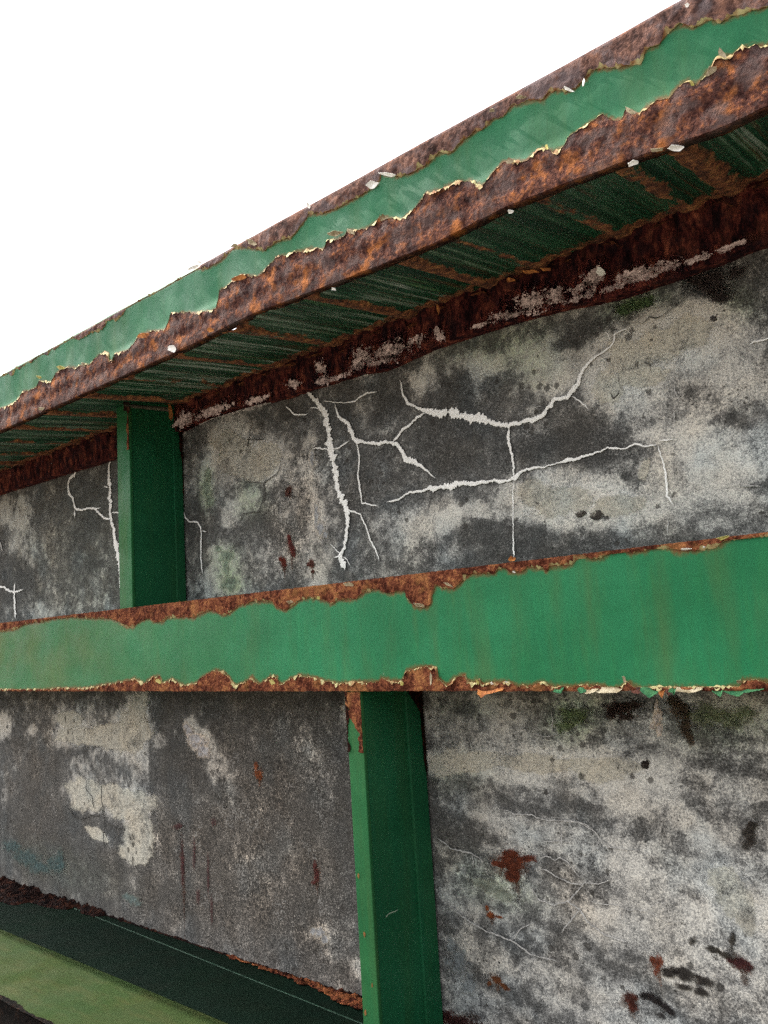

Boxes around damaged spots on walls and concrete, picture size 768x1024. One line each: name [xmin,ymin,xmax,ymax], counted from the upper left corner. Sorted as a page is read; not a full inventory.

corrosion [0,0,768,430]
corrosion [168,179,768,494]
flaking render [592,313,717,404]
crack [67,461,120,588]
crack [184,514,206,573]
flaking render [210,429,282,482]
corrosion [0,532,768,632]
crack [286,299,687,569]
flaking render [518,477,646,520]
damp [640,991,675,1019]
damp [661,966,714,997]
damp [688,932,735,959]